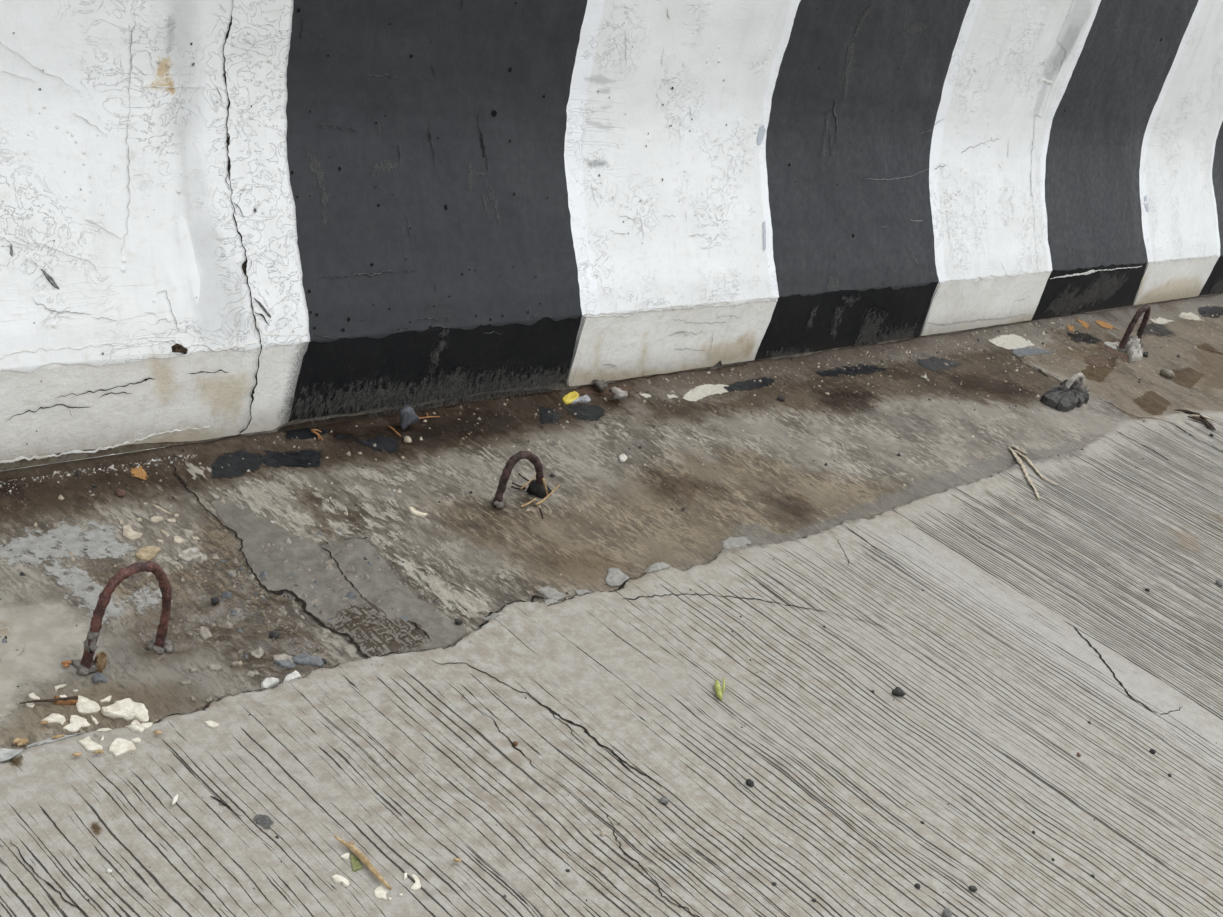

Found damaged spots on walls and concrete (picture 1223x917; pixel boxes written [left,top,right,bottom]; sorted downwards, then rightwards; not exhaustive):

crack [188,5,269,435]
crack [6,378,154,422]
crack [148,688,267,750]
crack [172,465,394,668]
crack [322,537,660,785]
crack [1074,627,1180,714]